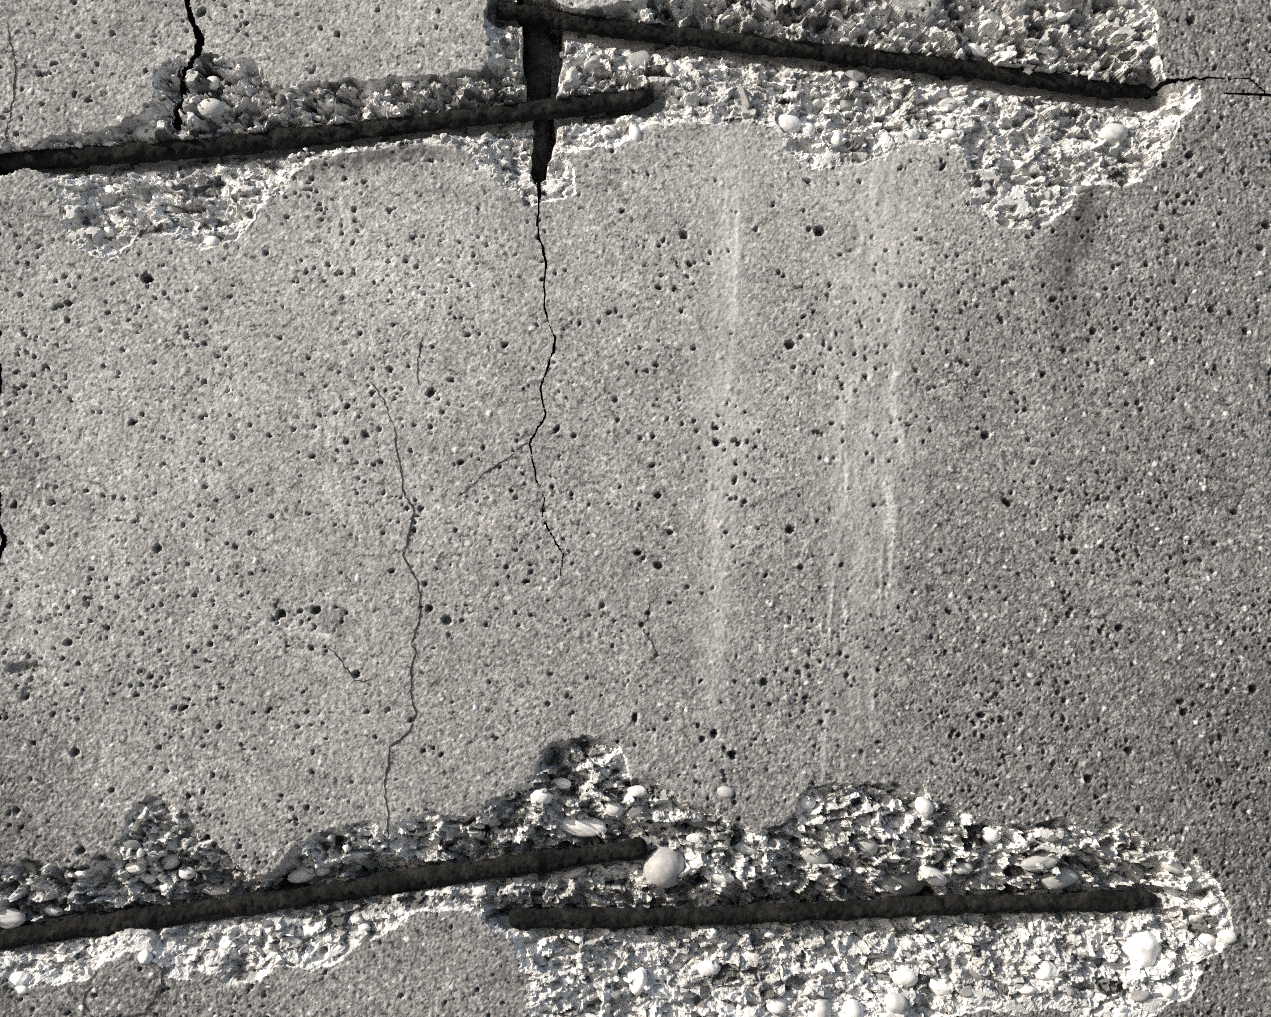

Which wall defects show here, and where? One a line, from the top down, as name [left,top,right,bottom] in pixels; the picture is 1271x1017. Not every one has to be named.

crack [5,25,17,143]
crack [172,0,205,130]
rust [336,148,433,165]
crack [517,0,525,34]
spalling [0,0,1202,261]
crack [1142,76,1270,99]
crack [0,331,8,395]
crack [460,191,564,576]
crack [0,492,8,561]
spalling [0,735,1237,1017]